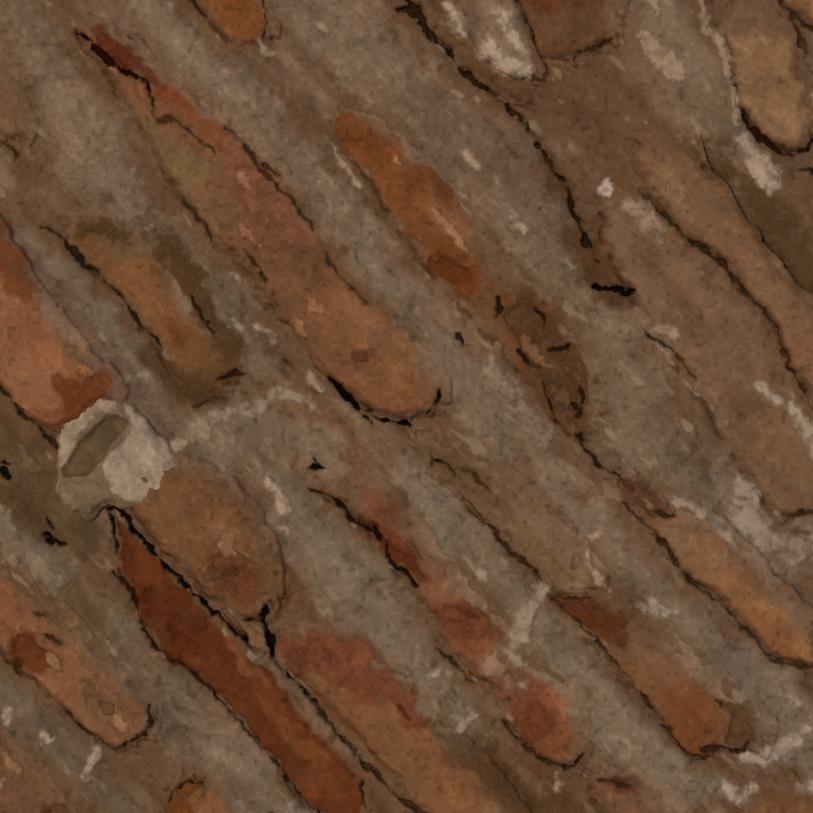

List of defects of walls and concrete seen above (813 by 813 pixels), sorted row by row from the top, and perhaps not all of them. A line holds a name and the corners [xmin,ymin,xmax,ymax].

crack [76,33,215,153]
crack [224,127,313,230]
damp [442,1,467,38]
crack [397,0,600,264]
damp [479,7,534,80]
damp [636,30,686,82]
damp [698,0,813,292]
crack [592,284,635,296]
damp [755,382,813,459]
crack [108,506,276,662]
crack [310,489,418,587]
crack [287,672,426,813]